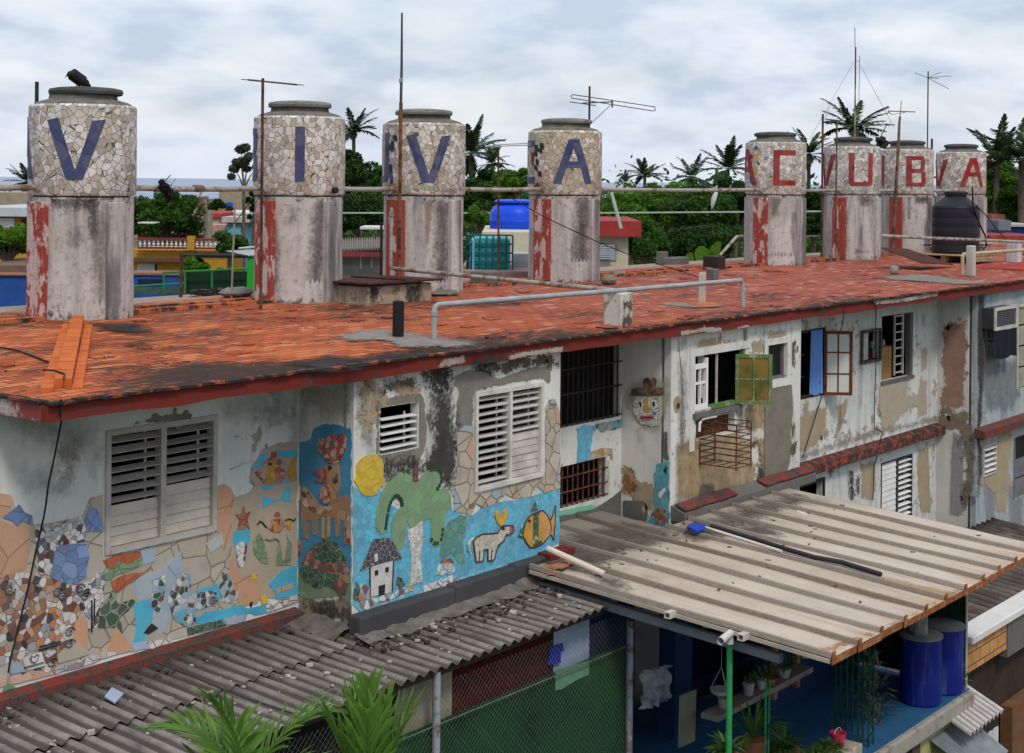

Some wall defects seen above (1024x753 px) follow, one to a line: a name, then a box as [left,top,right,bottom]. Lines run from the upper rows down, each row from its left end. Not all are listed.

peeling [27,210,39,280]
peeling [534,200,546,279]
peeling [355,370,434,438]
leakage [292,349,509,497]
peeling [488,350,559,382]
peeling [621,404,765,524]
peeling [791,396,850,456]
peeling [875,317,1013,516]